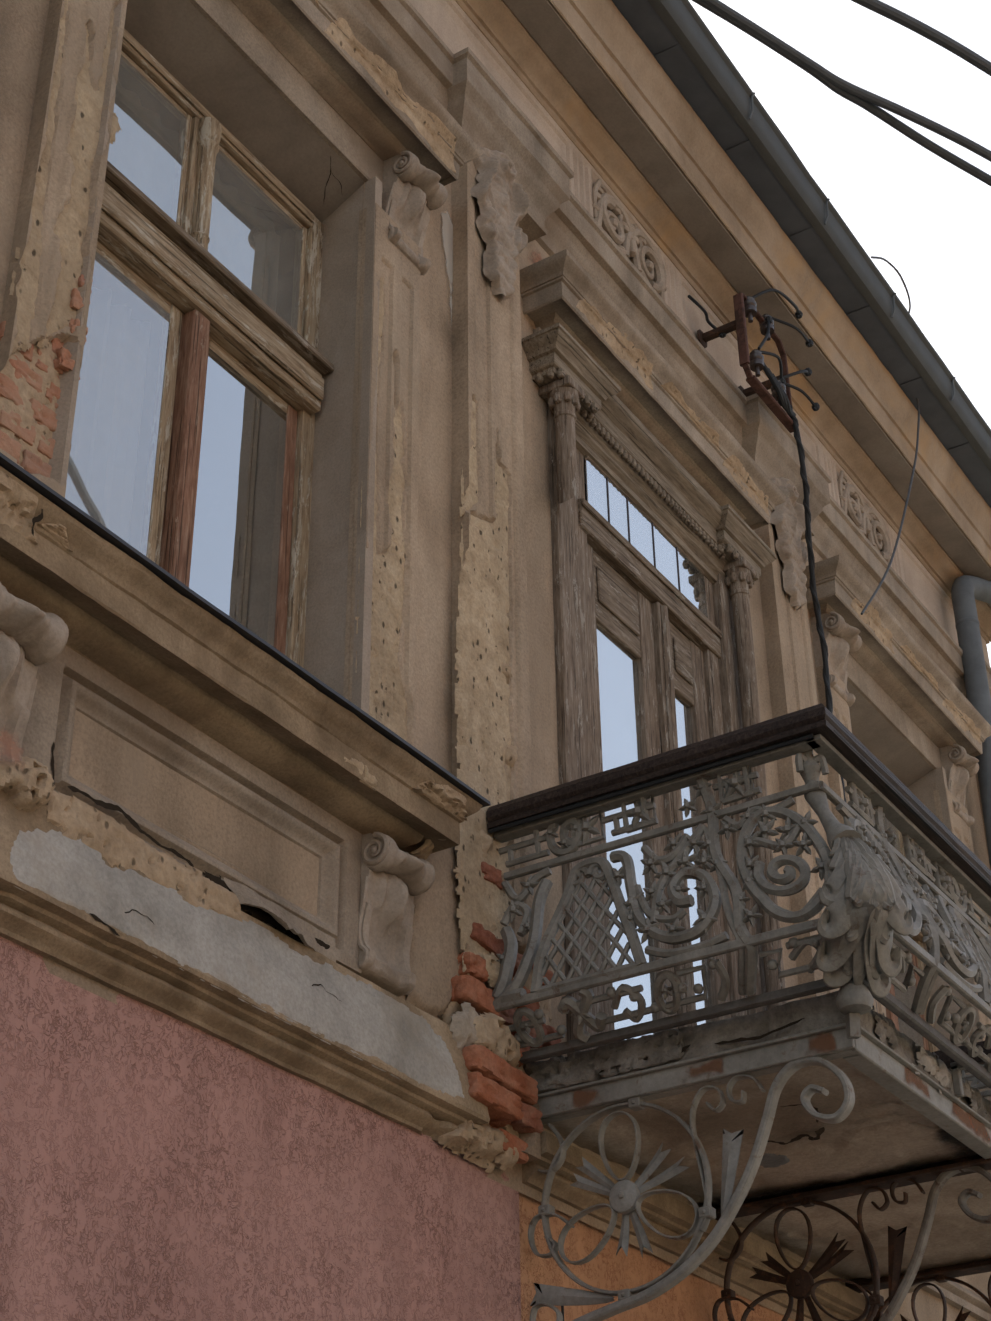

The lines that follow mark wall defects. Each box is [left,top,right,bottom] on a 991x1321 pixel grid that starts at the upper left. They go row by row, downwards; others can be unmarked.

spalling [0,0,122,552]
spalling [355,406,407,741]
spalling [0,732,243,923]
spalling [344,757,379,791]
spalling [409,401,561,1173]
crack [753,1104,825,1145]